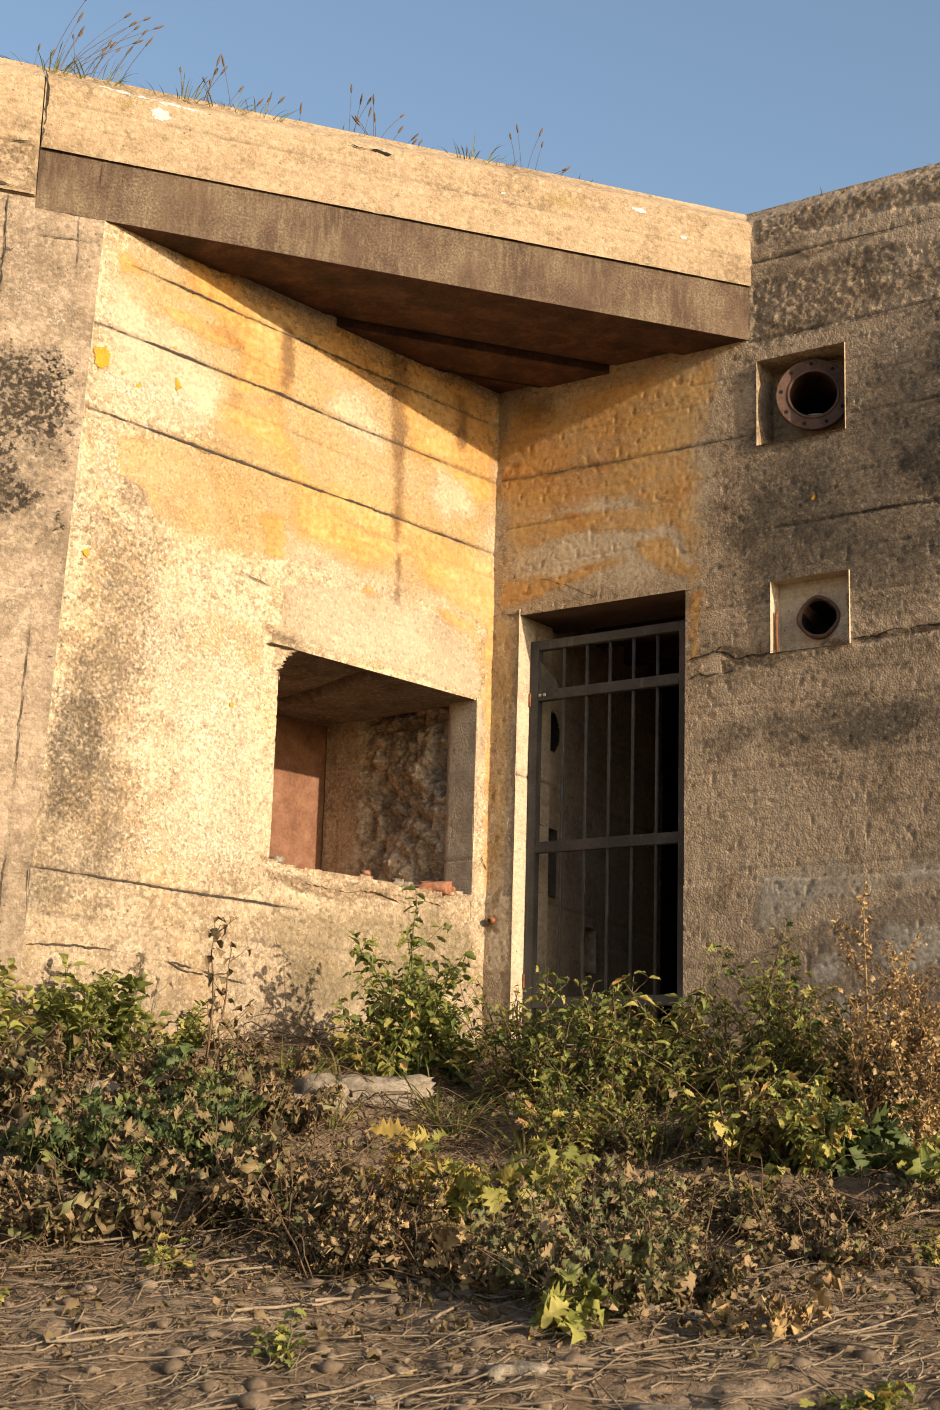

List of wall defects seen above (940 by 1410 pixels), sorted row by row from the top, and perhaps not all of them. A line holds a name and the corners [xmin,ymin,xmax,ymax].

leakage [0,246,713,904]
crack [685,647,772,680]
leakage [733,336,940,609]
crack [851,623,940,639]